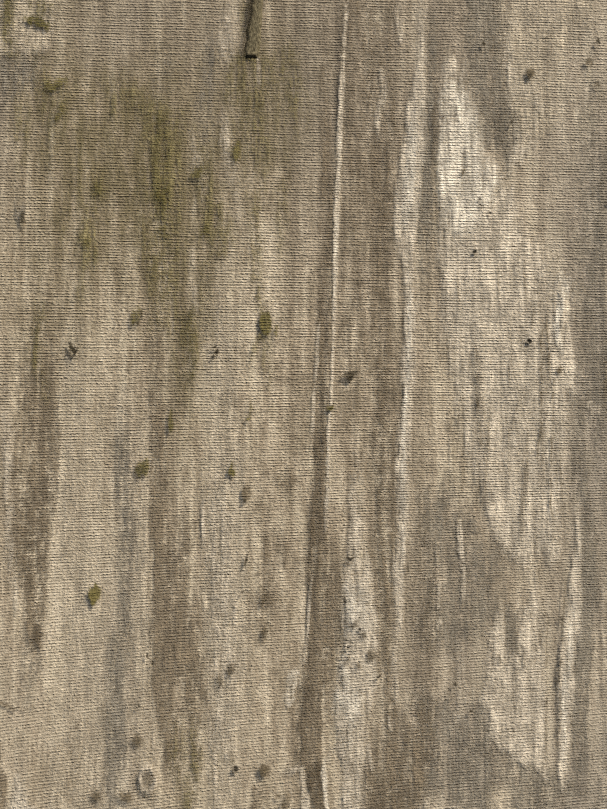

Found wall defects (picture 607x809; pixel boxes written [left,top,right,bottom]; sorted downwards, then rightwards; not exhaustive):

leakage [0,270,297,809]
leakage [287,0,607,809]